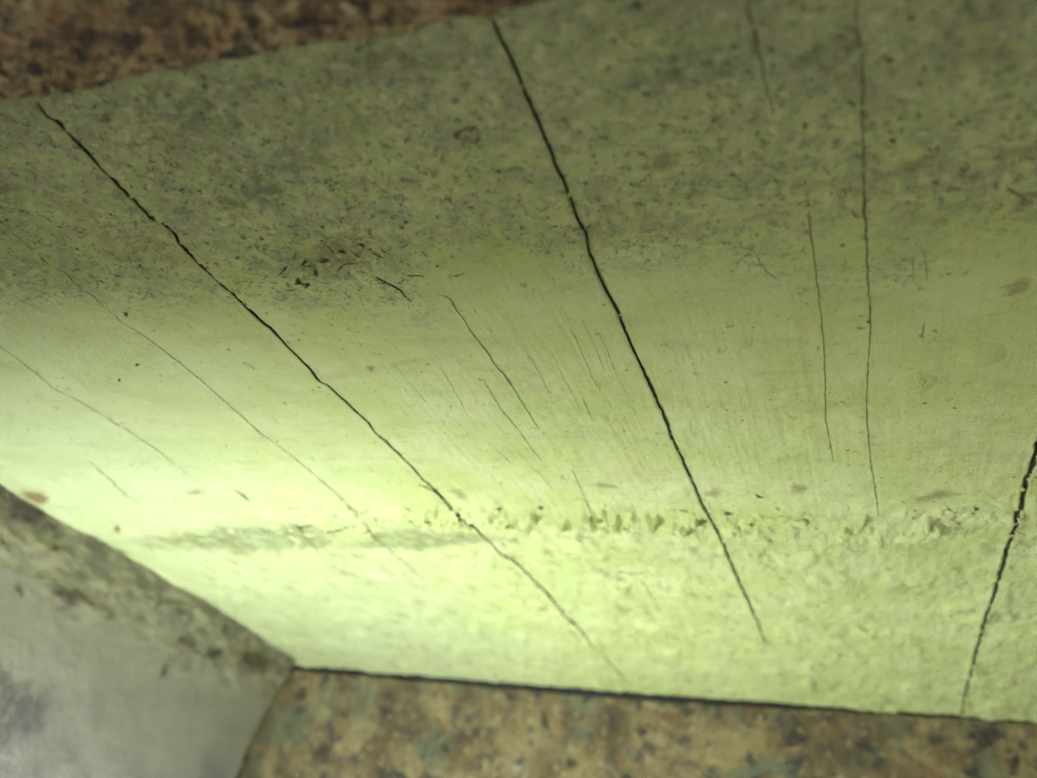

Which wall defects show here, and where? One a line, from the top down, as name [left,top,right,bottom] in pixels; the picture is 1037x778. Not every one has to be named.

crack [0,105,631,686]
crack [493,20,766,644]
crack [746,0,773,111]
crack [852,0,879,515]
crack [957,434,1037,714]